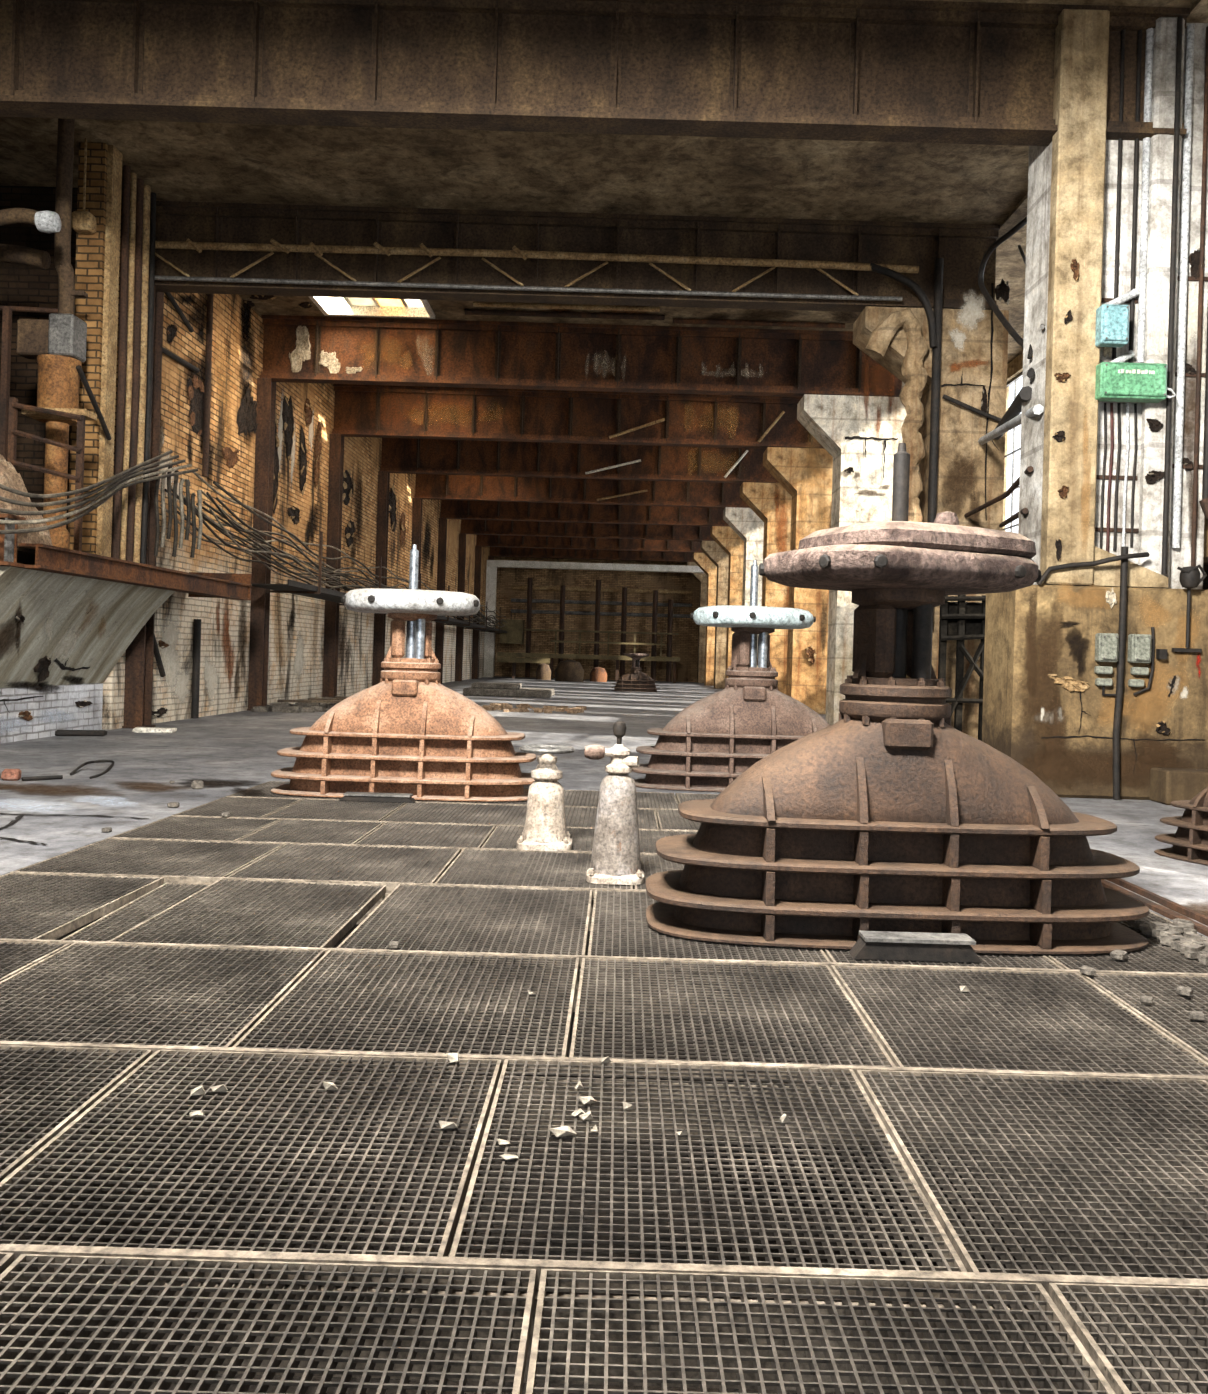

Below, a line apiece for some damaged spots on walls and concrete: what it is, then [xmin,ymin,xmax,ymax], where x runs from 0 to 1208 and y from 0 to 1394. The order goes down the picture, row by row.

spalling [1070,259,1079,281]
peeling [289,325,363,374]
spalling [1054,372,1070,382]
spalling [981,385,989,413]
spalling [222,387,258,468]
flaking render [273,396,324,525]
spalling [34,655,51,683]